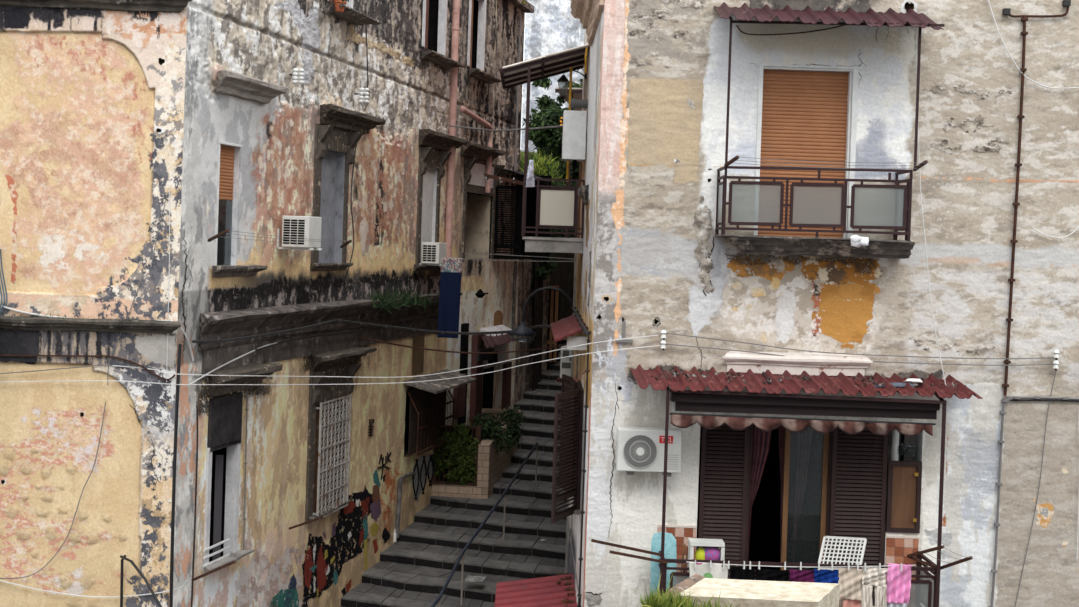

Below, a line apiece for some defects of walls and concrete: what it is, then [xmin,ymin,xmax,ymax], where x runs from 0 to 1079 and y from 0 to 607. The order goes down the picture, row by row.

peeling [0,10,183,320]
leakage [39,330,111,365]
peeling [141,362,174,433]
leakage [205,268,435,310]
peeling [692,195,884,349]
peeling [0,404,171,607]